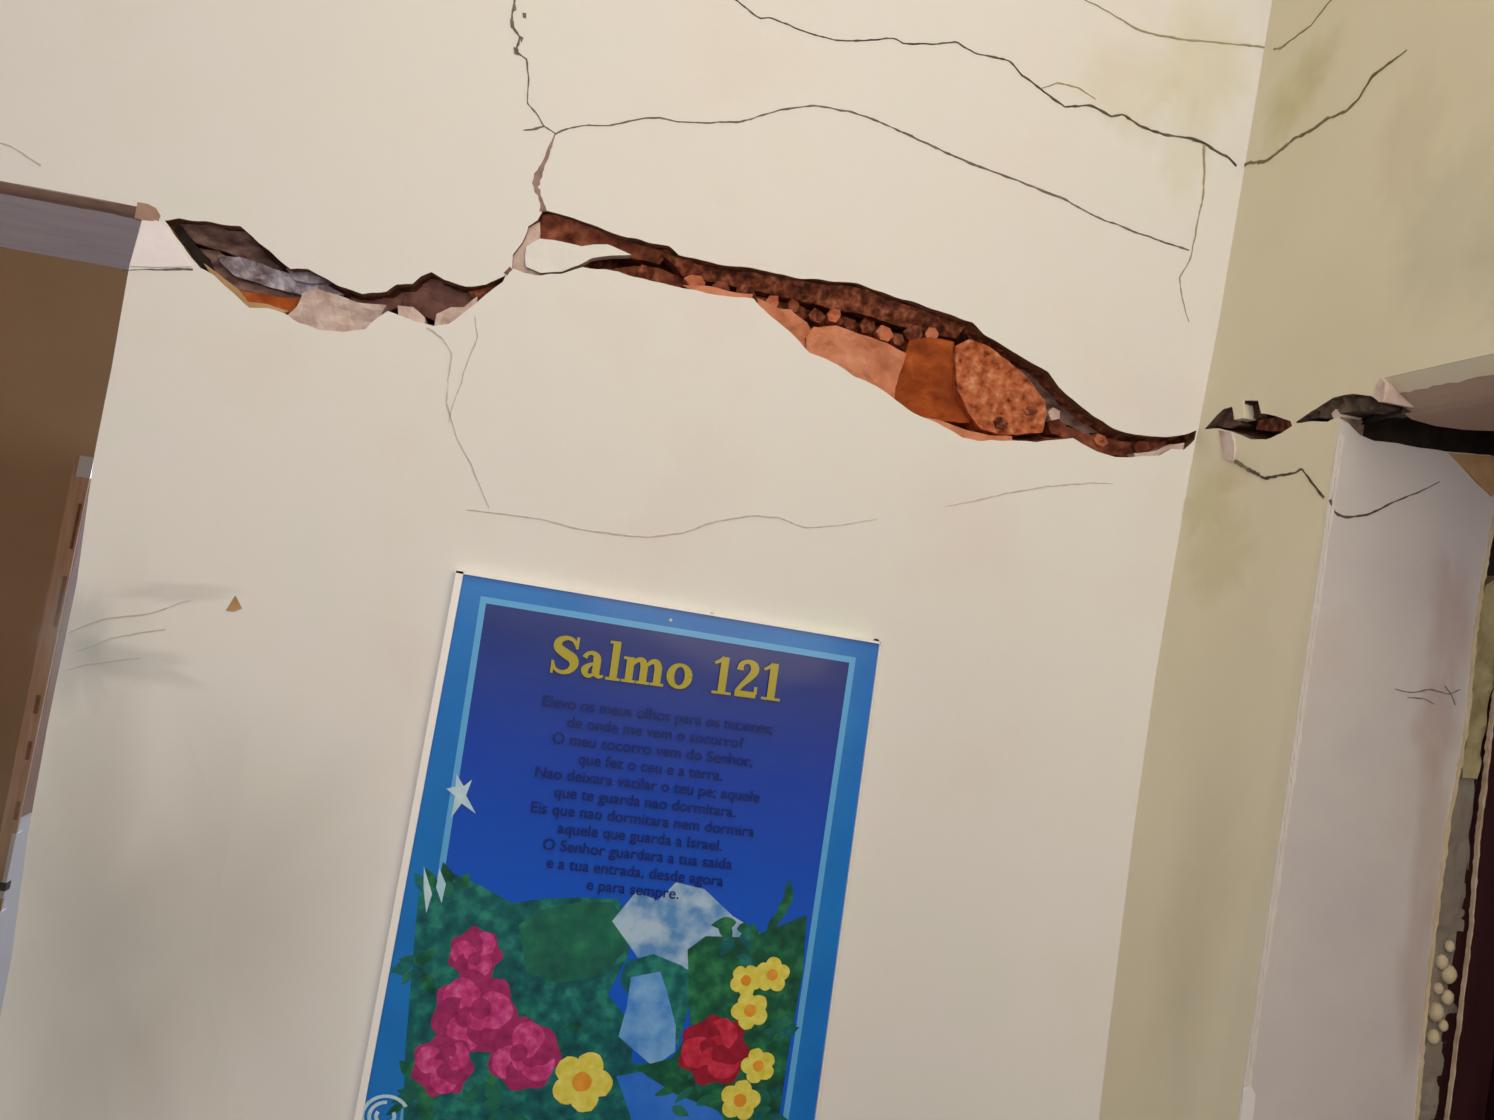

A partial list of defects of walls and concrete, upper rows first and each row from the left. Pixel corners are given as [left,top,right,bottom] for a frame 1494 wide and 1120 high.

crack [124,0,1494,538]